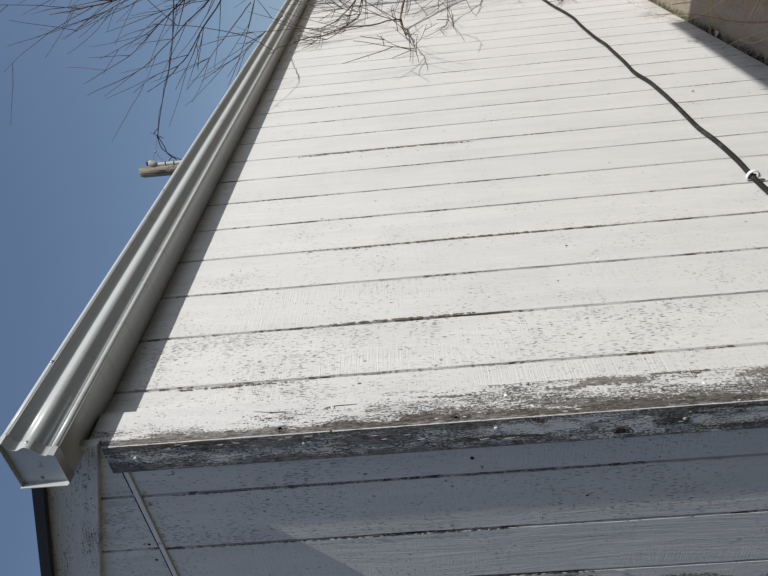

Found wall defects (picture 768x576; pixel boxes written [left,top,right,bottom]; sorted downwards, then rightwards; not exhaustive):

peeling [179,381,291,391]
peeling [544,369,710,391]
peeling [729,366,768,379]
peeling [129,393,768,451]